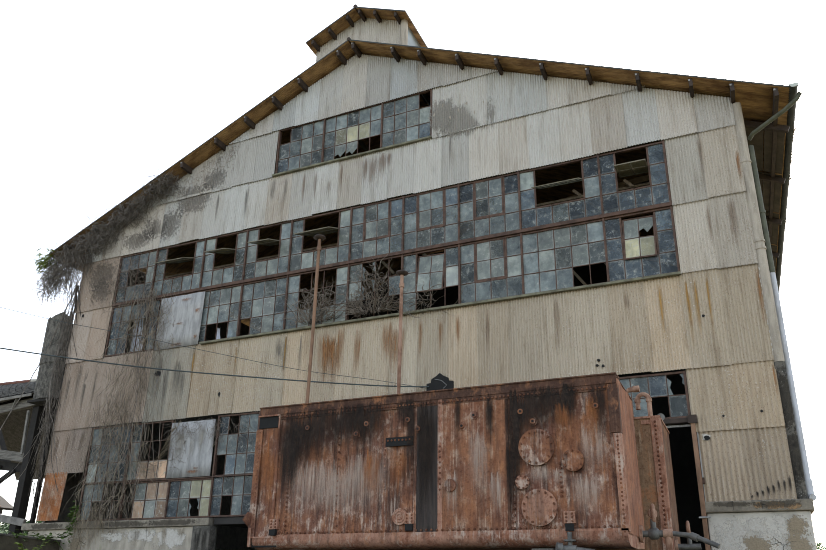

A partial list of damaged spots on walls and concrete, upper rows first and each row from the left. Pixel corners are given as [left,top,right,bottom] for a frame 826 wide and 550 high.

corrosion [36,472,68,521]
spalling [712,501,815,550]